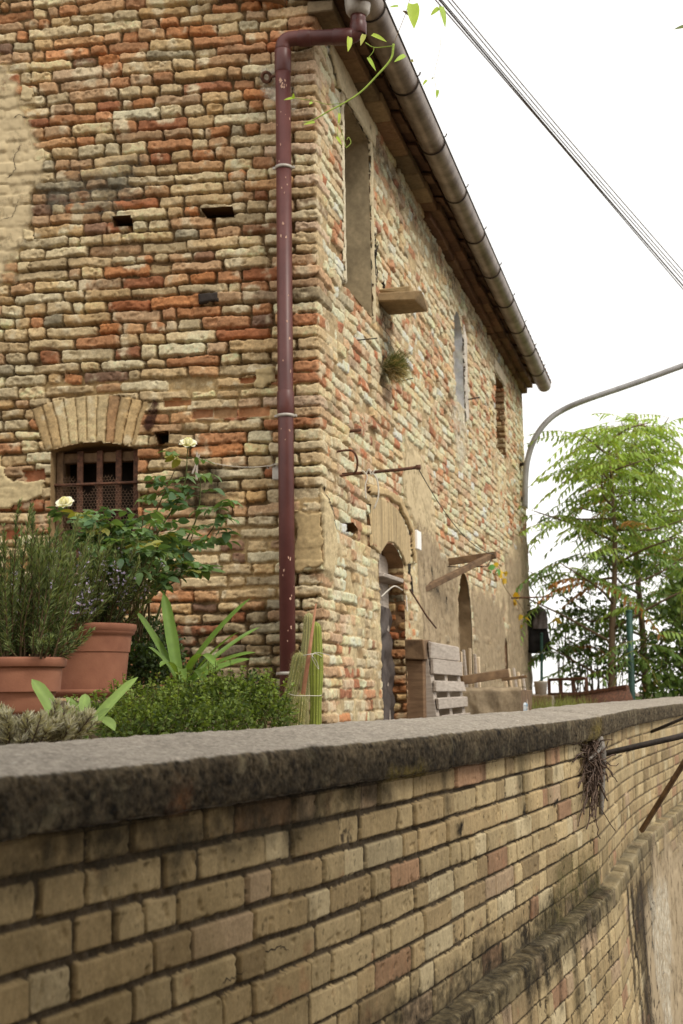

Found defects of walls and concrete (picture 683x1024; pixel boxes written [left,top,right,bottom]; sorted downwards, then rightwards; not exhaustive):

peeling [0,70,46,280]
spalling [0,466,46,509]
damp [627,842,672,1024]